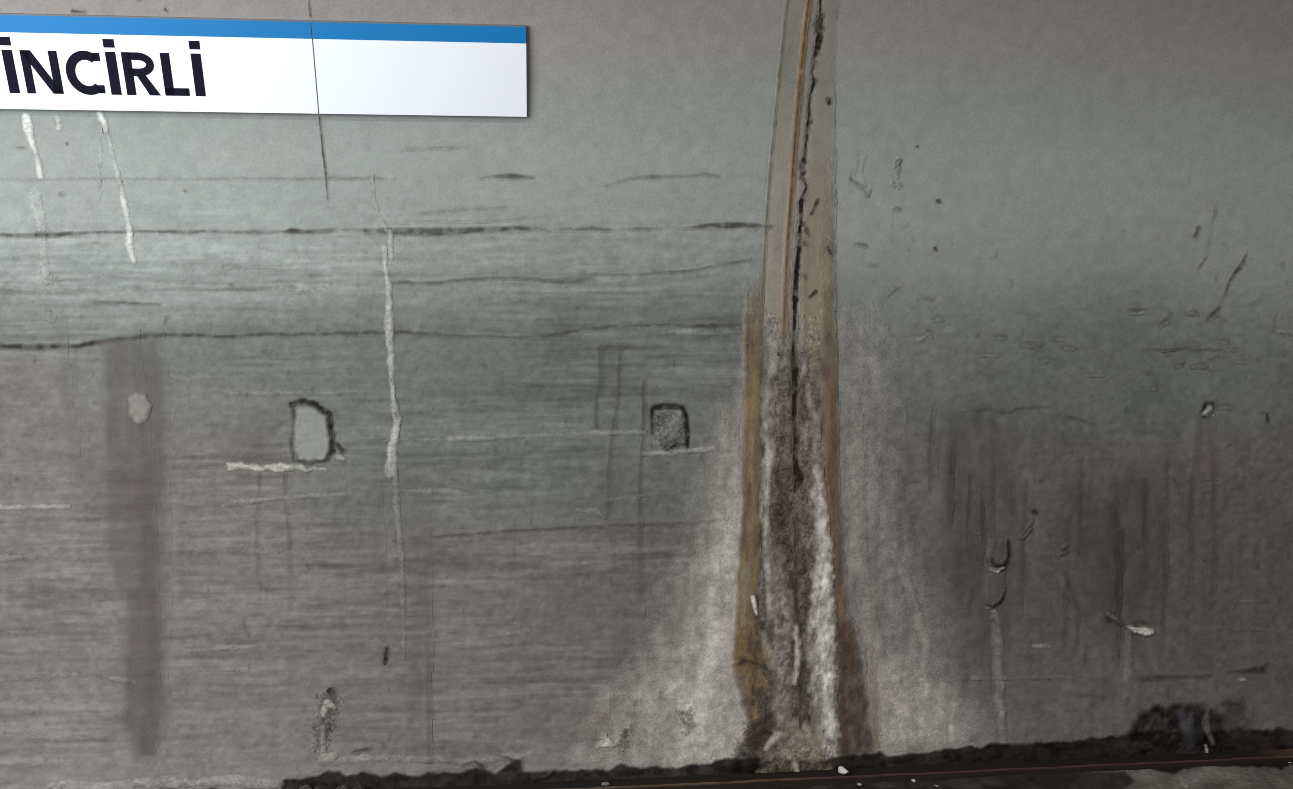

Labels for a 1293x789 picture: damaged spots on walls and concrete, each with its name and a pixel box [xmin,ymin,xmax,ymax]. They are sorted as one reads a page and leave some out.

leakage [20,112,57,285]
leakage [96,111,137,265]
spalling [225,398,346,473]
crack [0,0,825,732]
leakage [0,174,1293,789]
spalling [641,402,717,457]
rust [728,0,813,723]
spalling [1102,611,1261,757]